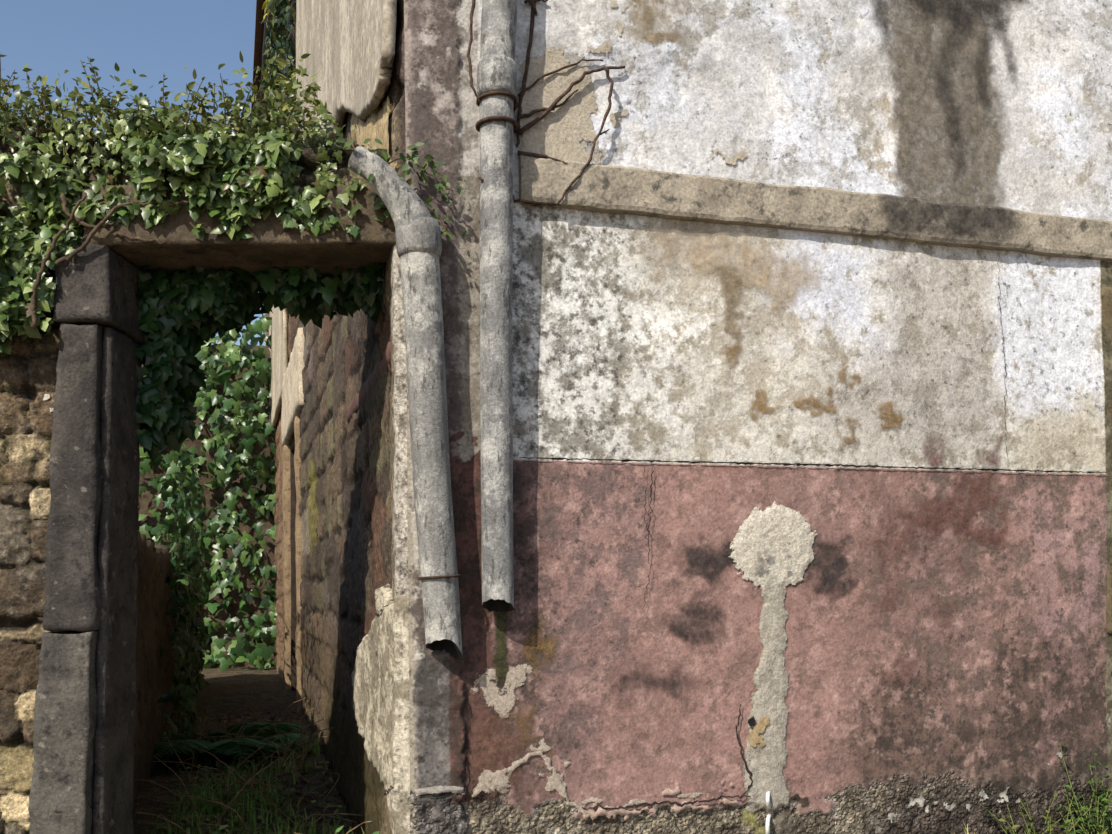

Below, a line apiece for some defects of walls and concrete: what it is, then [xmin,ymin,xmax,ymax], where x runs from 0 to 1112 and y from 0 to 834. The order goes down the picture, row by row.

damp [877,0,1015,239]
spalling [352,583,739,834]
crack [582,704,753,830]
spalling [748,716,770,751]
spalling [786,787,816,807]